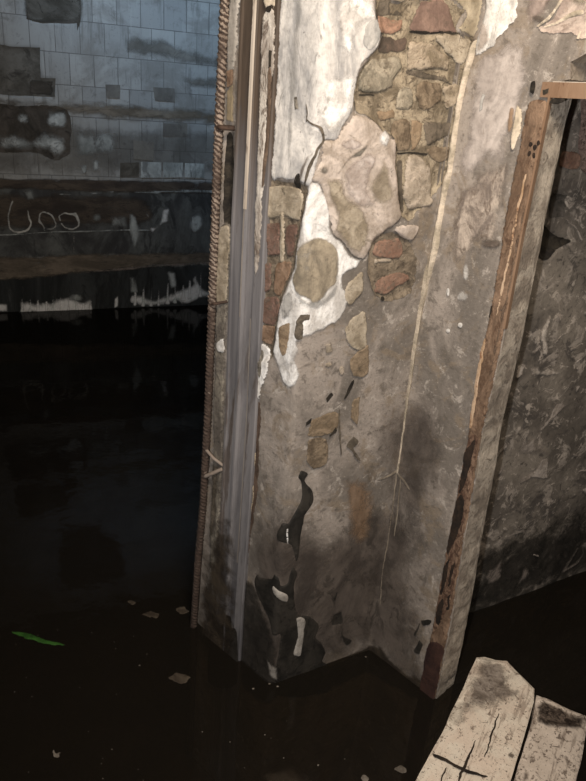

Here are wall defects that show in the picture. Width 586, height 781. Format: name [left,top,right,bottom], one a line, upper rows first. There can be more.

peeling [25,0,81,30]
peeling [0,44,72,160]
crack [300,106,325,186]
flaking render [254,0,518,359]
flaking render [511,106,522,150]
flaking render [559,151,581,170]
flaking render [550,193,567,218]
flaking render [538,226,571,260]
peeling [532,314,565,354]
peeling [517,366,555,378]
leakage [389,407,437,513]
leakage [200,467,421,688]